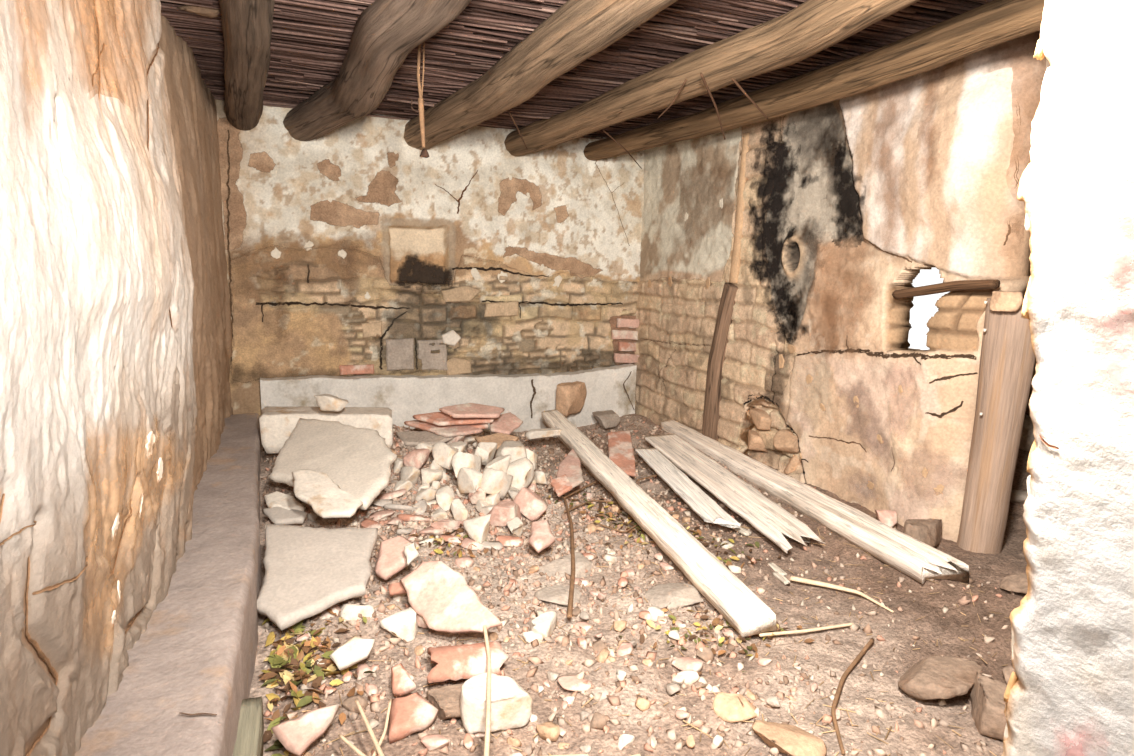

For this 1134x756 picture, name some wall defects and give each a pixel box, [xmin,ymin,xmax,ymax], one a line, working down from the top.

leakage [829,137,865,243]
spalling [217,115,803,475]
crack [452,267,623,318]
crack [529,379,537,418]
crack [744,339,978,482]
crack [0,494,132,686]
crack [25,716,52,756]